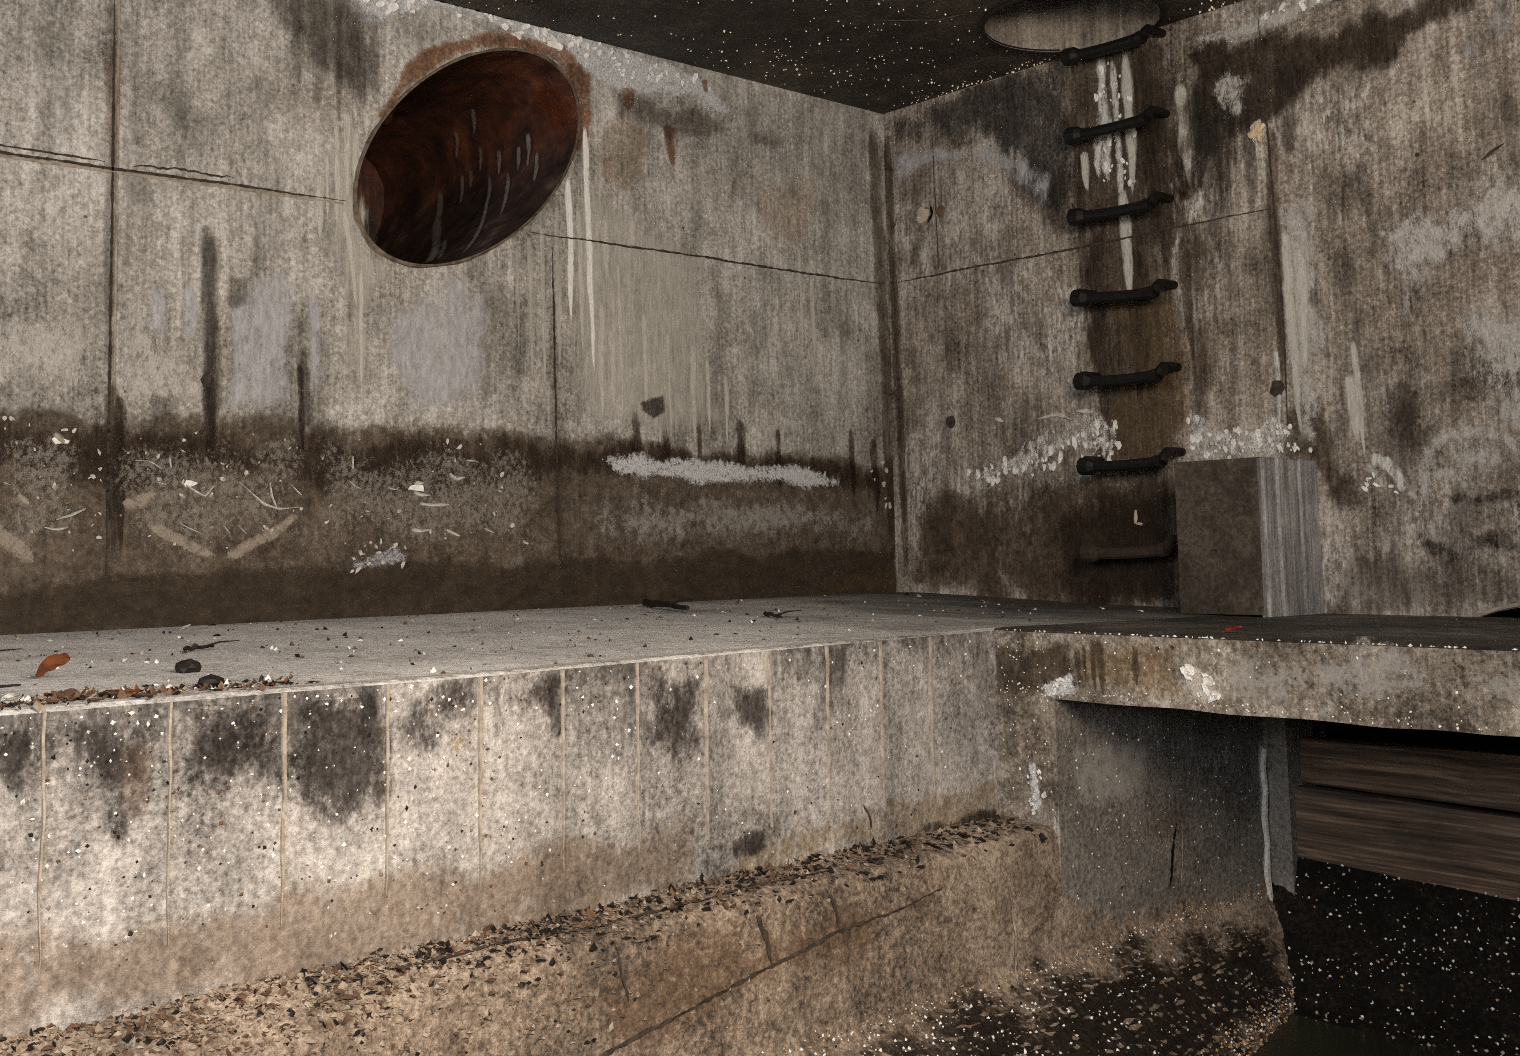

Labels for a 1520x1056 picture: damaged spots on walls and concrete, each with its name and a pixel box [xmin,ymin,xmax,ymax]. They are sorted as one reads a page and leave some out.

leakage [897,55,1146,290]
leakage [1175,0,1464,197]
leakage [0,113,896,634]
leakage [1345,342,1365,455]